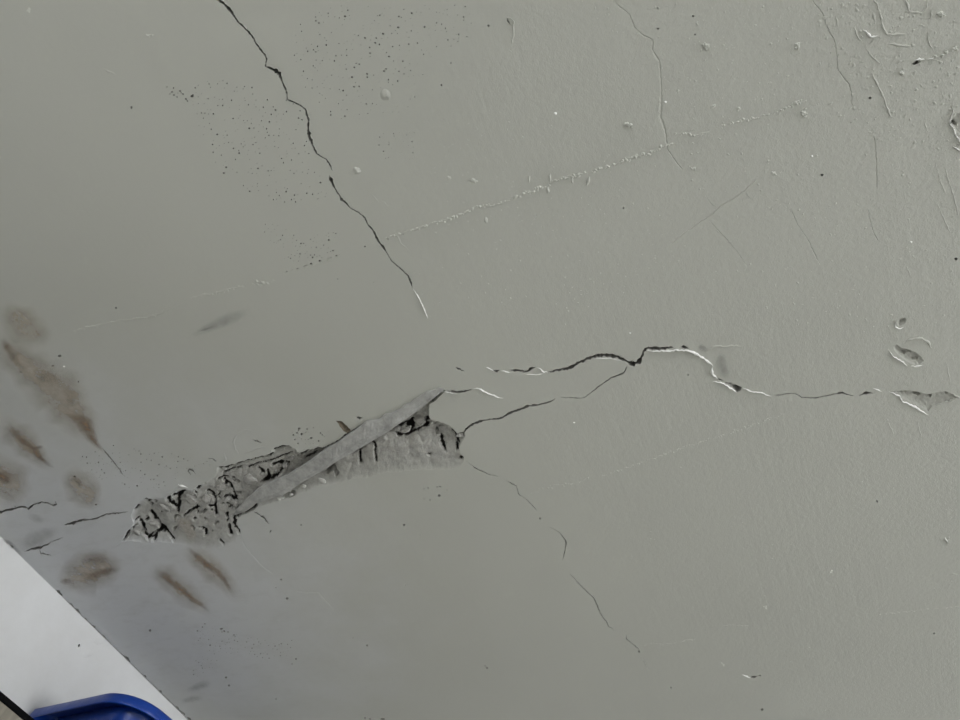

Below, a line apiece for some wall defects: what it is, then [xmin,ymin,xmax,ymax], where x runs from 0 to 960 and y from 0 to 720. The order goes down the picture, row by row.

crack [217,0,428,318]
crack [444,345,882,435]
peeling [888,337,932,367]
crack [0,501,126,556]
flaking render [121,387,468,549]
crack [466,461,648,670]
crack [56,590,191,720]